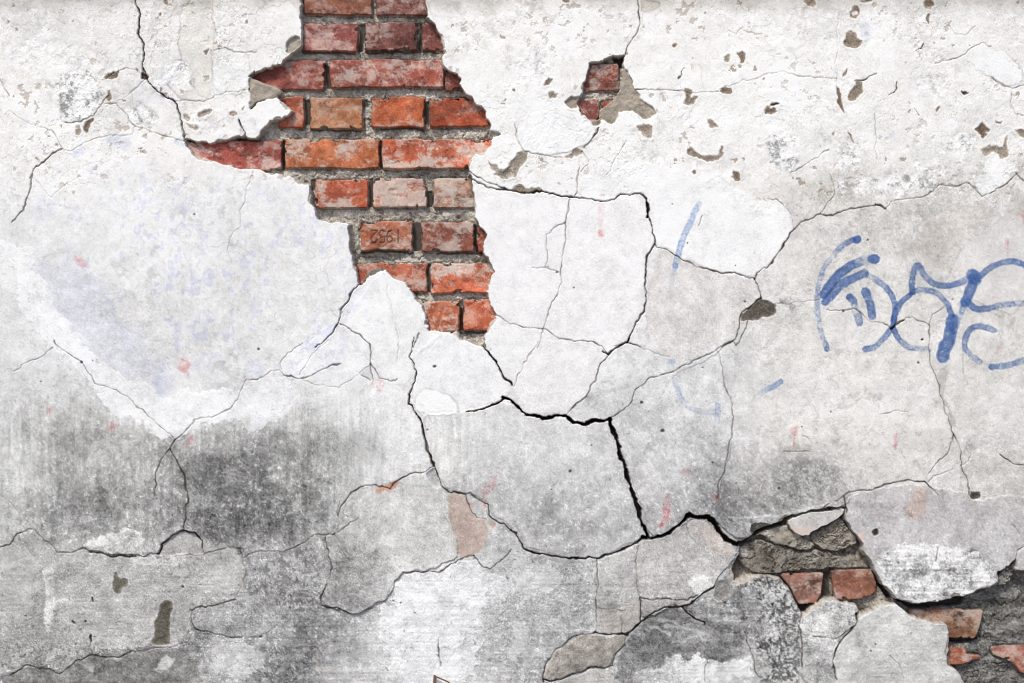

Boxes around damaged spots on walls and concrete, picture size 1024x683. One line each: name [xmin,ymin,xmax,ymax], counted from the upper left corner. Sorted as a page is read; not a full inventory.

peeling [844,0,873,48]
crack [0,0,248,224]
spalling [183,0,542,348]
crack [514,124,562,159]
spalling [544,56,656,139]
peeling [837,69,864,114]
peeling [975,122,1024,160]
peeling [741,299,777,322]
crack [0,150,1024,683]
leakage [18,398,382,558]
spalling [714,507,1024,683]
leakage [286,608,372,683]